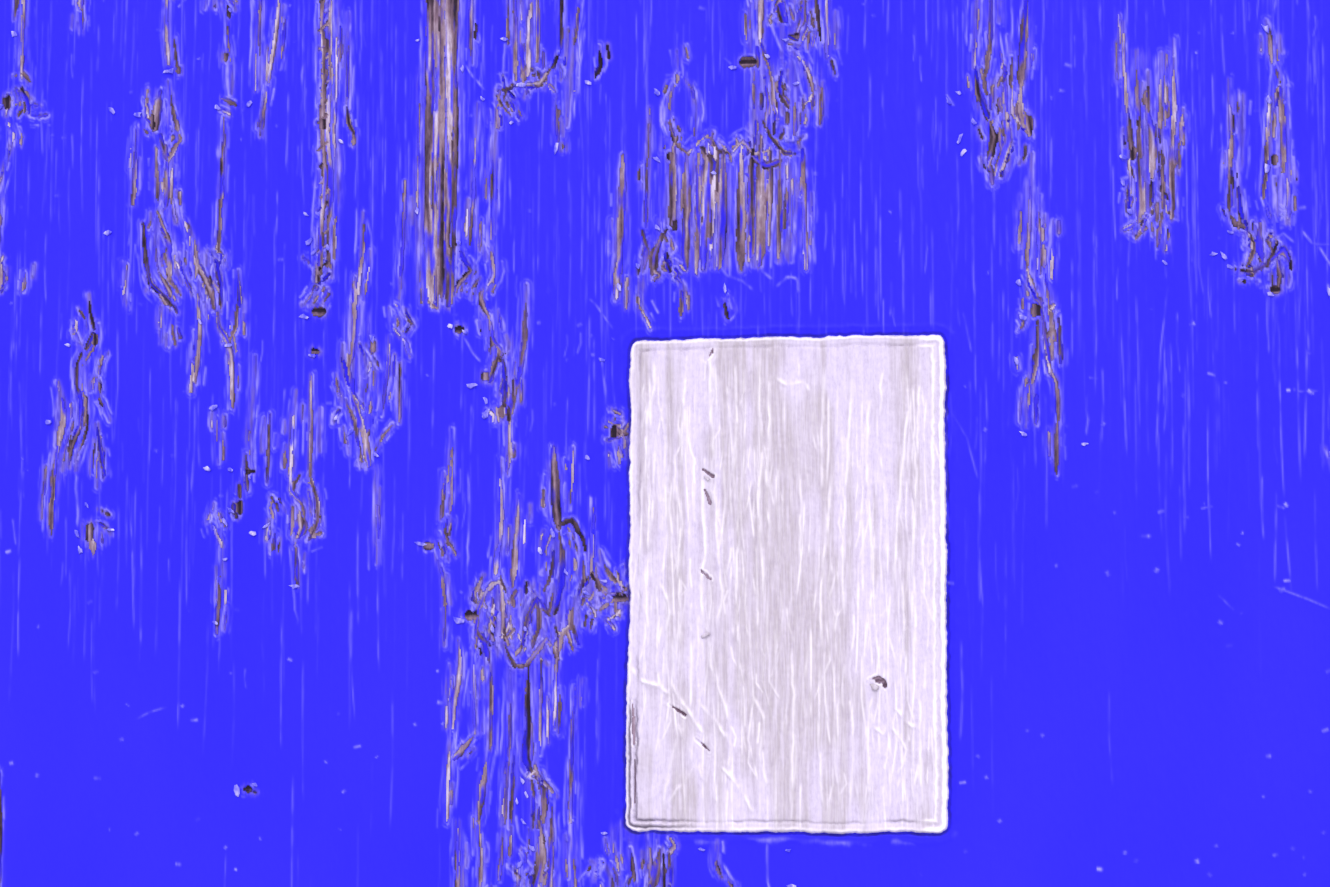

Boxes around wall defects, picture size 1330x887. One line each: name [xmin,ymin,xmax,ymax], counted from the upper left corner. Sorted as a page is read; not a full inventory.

peeling [0,256,27,293]
peeling [0,0,47,154]
peeling [122,0,322,589]
peeling [613,0,836,328]
peeling [946,0,1034,185]
peeling [1116,14,1185,265]
peeling [1209,24,1297,296]
peeling [334,0,676,887]